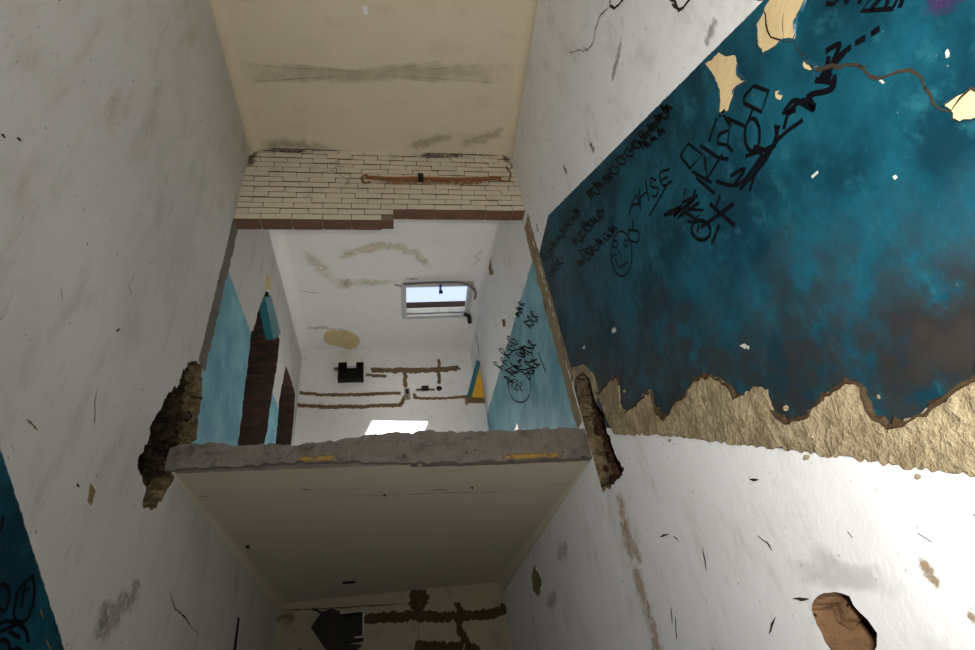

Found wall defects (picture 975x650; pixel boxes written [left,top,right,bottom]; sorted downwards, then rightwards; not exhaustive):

crack [570,0,623,53]
crack [670,0,690,12]
peeling [755,0,807,55]
peeling [705,53,746,115]
crack [757,0,975,113]
peeling [941,90,975,125]
spalling [137,215,975,510]
spalling [408,589,430,611]
spalling [812,592,877,650]